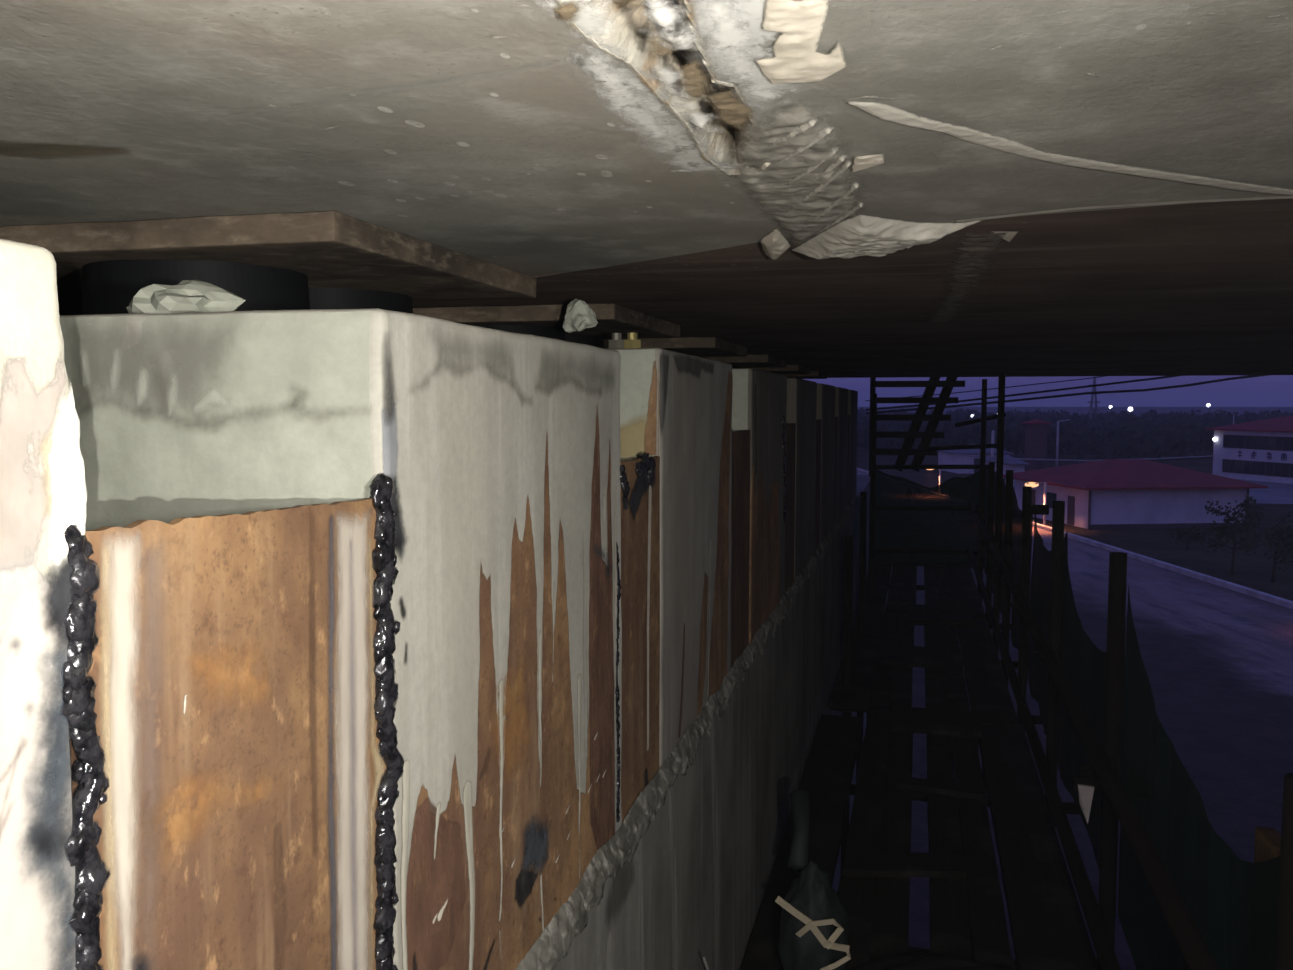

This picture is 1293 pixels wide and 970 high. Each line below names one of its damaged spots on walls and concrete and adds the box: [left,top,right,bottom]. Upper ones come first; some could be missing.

spalling [554,0,884,259]
crack [848,96,1293,222]
water stain [79,335,208,396]
corrosion [644,361,659,456]
corrosion [678,372,732,738]
corrosion [276,826,285,970]